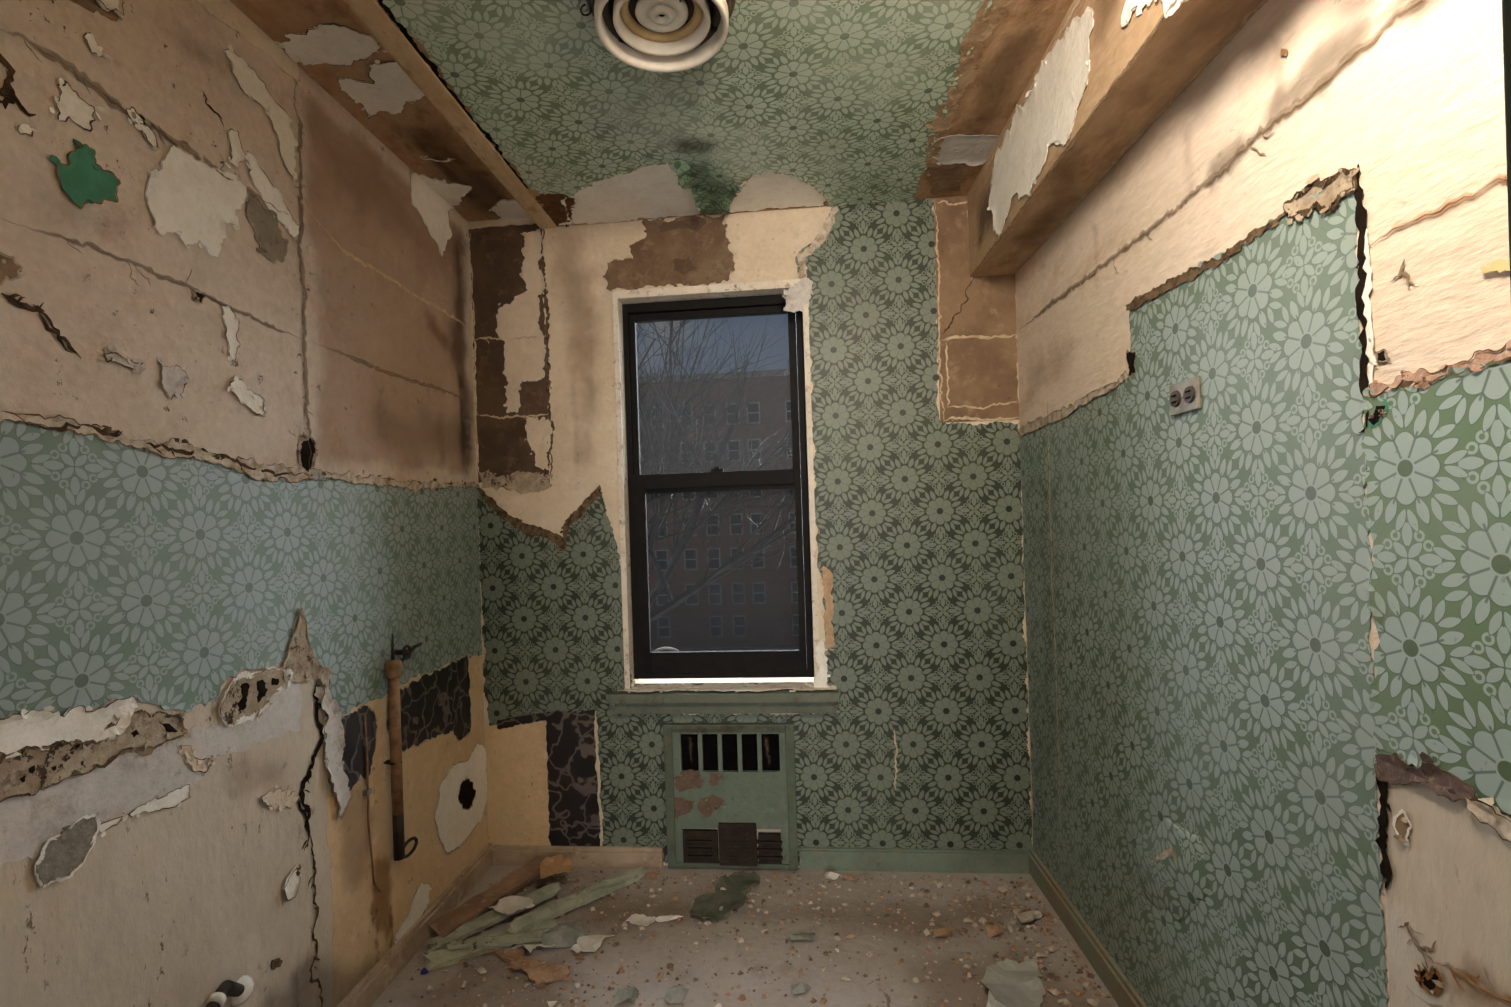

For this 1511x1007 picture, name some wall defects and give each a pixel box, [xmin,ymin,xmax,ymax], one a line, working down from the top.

peeling [49,45,299,264]
flaking render [377,161,833,495]
peeling [925,6,1094,236]
peeling [1121,0,1188,27]
crack [942,0,1422,334]
flaking render [1272,167,1360,227]
crack [1354,164,1507,433]
flaking render [1363,339,1511,429]
flaking render [0,709,218,888]
crack [297,680,326,1007]
crack [1375,777,1392,889]
crack [1399,922,1511,1007]